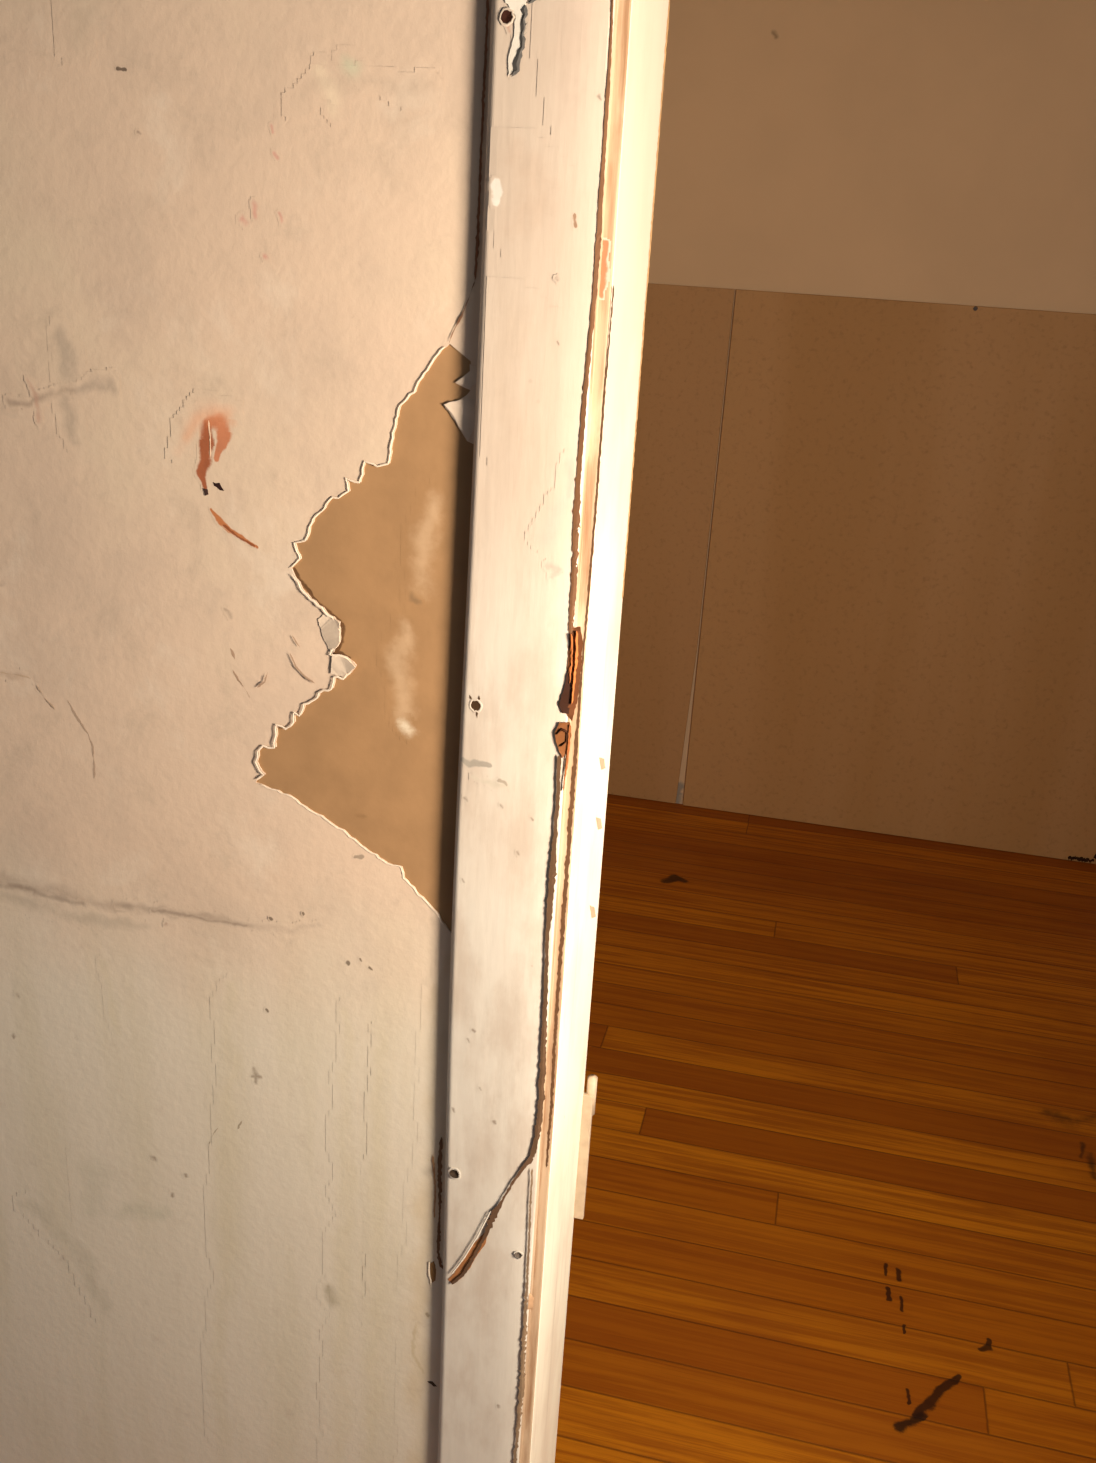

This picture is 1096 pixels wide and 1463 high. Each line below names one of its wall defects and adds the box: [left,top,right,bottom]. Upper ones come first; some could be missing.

peeling [505,0,536,80]
rust [165,389,259,550]
peeling [254,344,477,931]
crack [432,0,614,1463]
spalling [559,669,572,714]